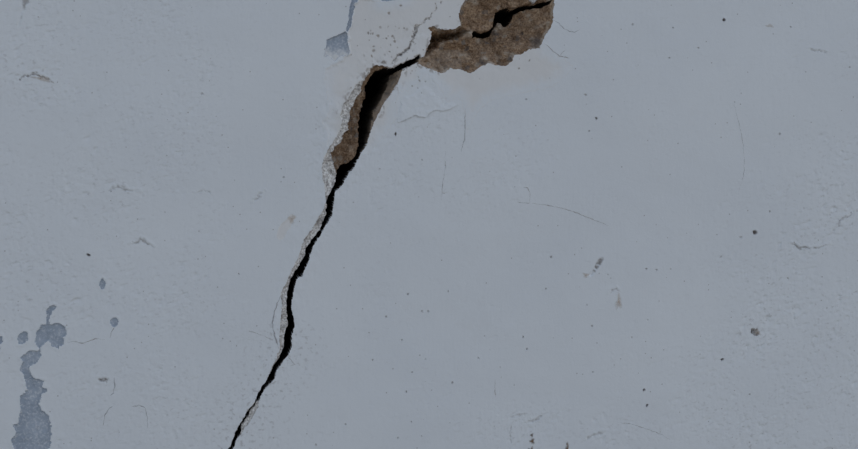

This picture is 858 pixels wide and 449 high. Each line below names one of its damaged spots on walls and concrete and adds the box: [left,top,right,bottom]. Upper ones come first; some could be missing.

peeling [322,0,573,154]
crack [228,3,437,449]
peeling [11,305,67,449]